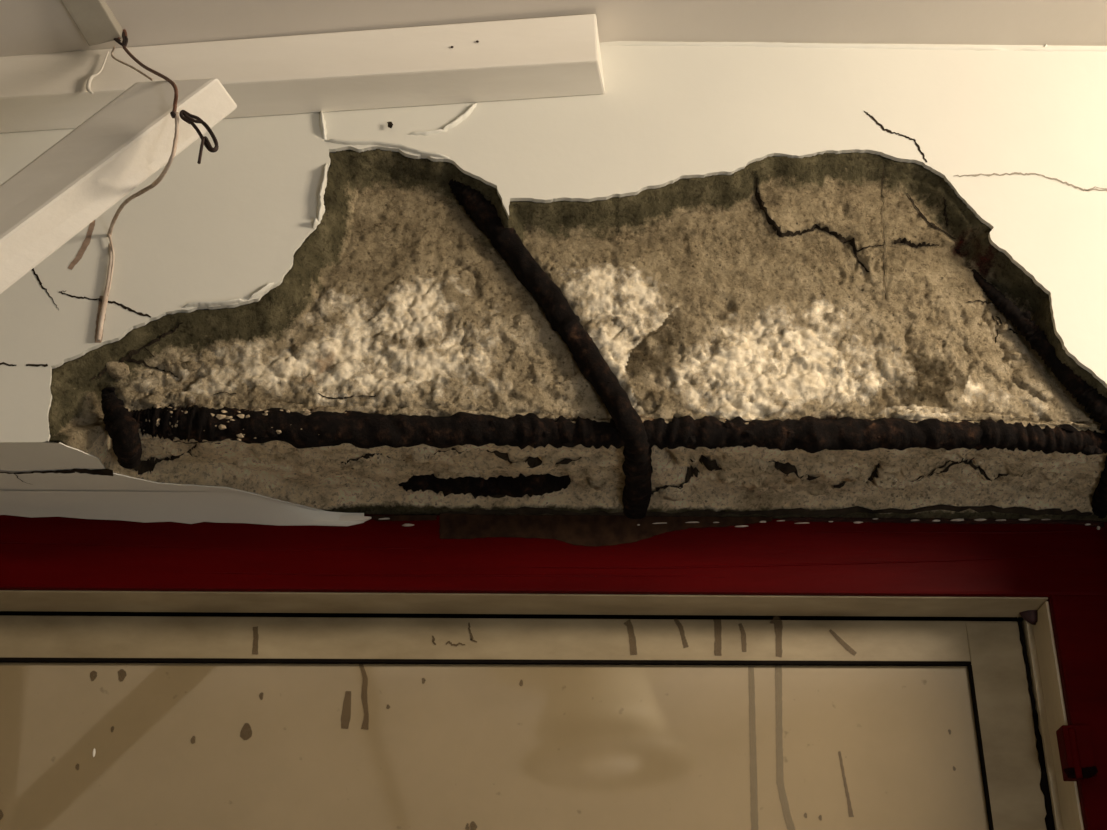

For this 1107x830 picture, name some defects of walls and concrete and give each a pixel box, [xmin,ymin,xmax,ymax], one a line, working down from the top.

crack [864,111,927,162]
crack [755,163,1107,299]
spalling [0,149,1107,530]